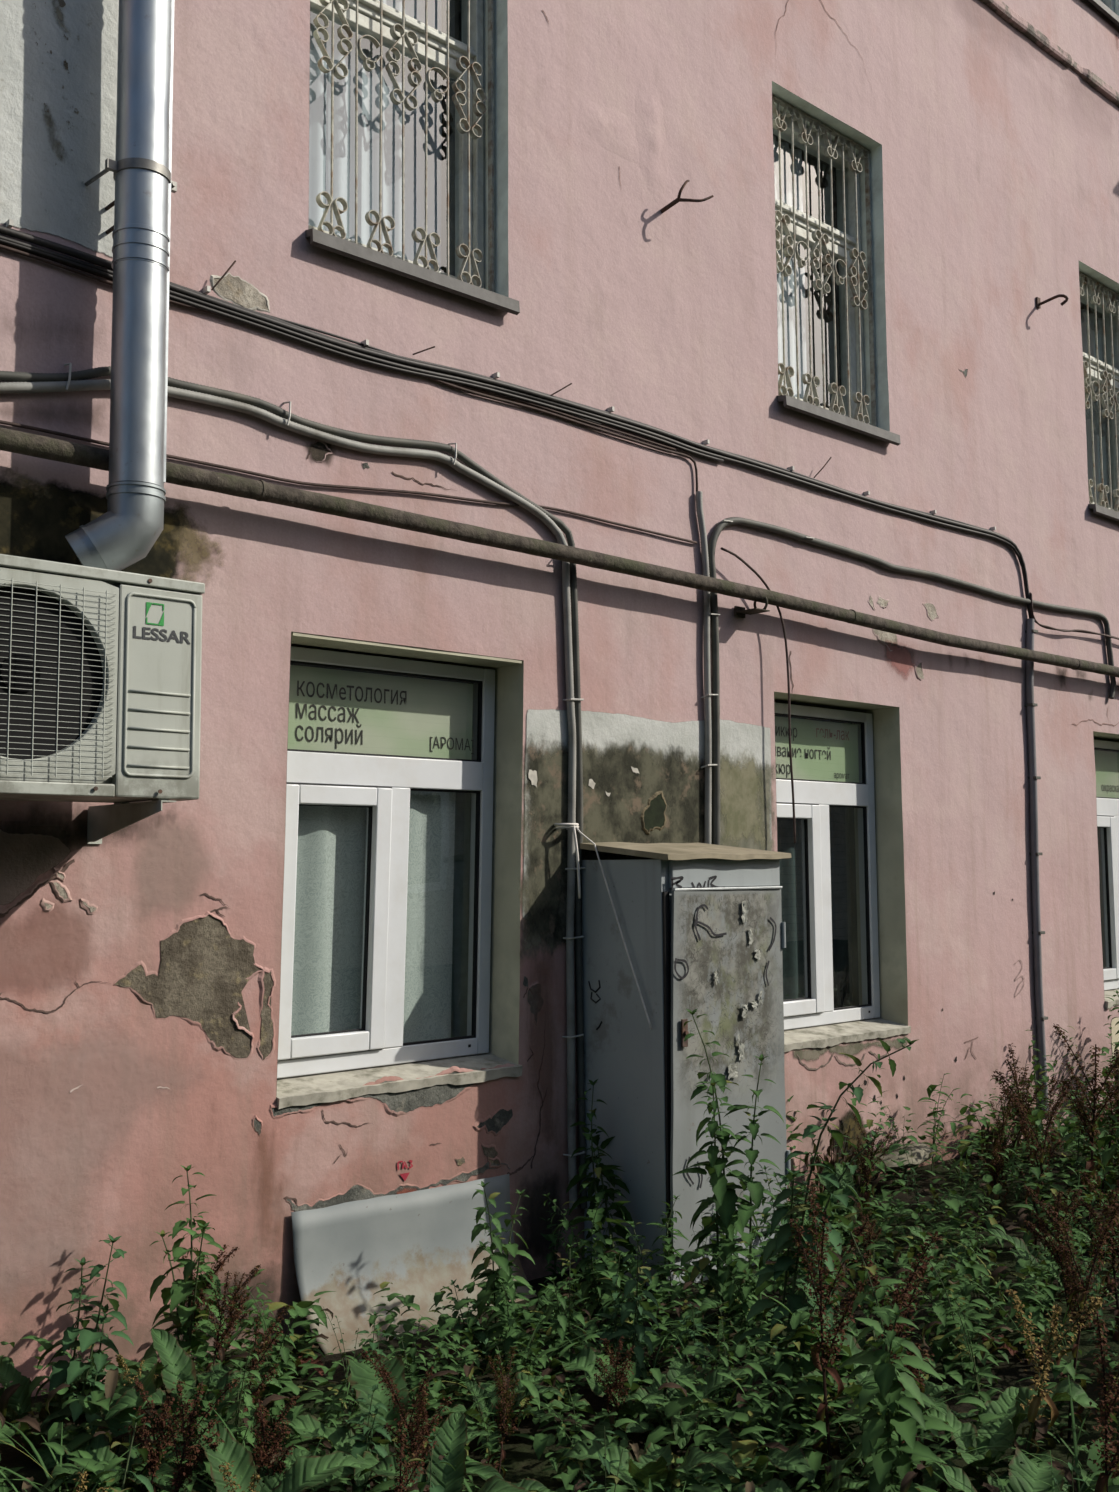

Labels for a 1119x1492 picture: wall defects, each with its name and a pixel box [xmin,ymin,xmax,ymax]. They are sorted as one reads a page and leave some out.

crack [775,0,872,88]
peeling [528,769,537,787]
spalling [643,794,666,830]
spalling [113,911,276,1061]
spalling [251,1063,514,1137]
spalling [283,1107,514,1212]